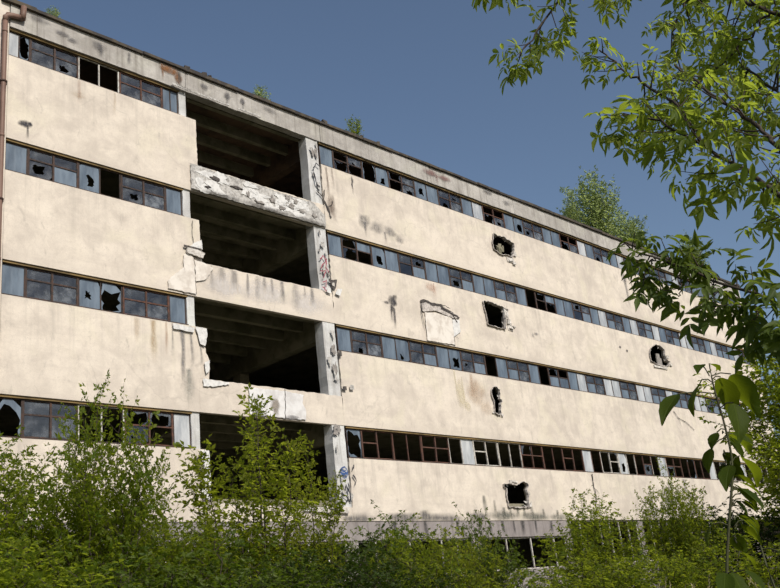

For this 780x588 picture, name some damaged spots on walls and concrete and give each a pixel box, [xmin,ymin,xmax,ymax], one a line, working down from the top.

peeling [190,163,342,296]
peeling [184,240,213,281]
spalling [491,233,517,266]
spalling [420,299,461,337]
spalling [482,300,516,332]
spalling [173,323,207,346]
spalling [649,344,673,370]
peeling [203,360,229,387]
spalling [502,480,532,508]